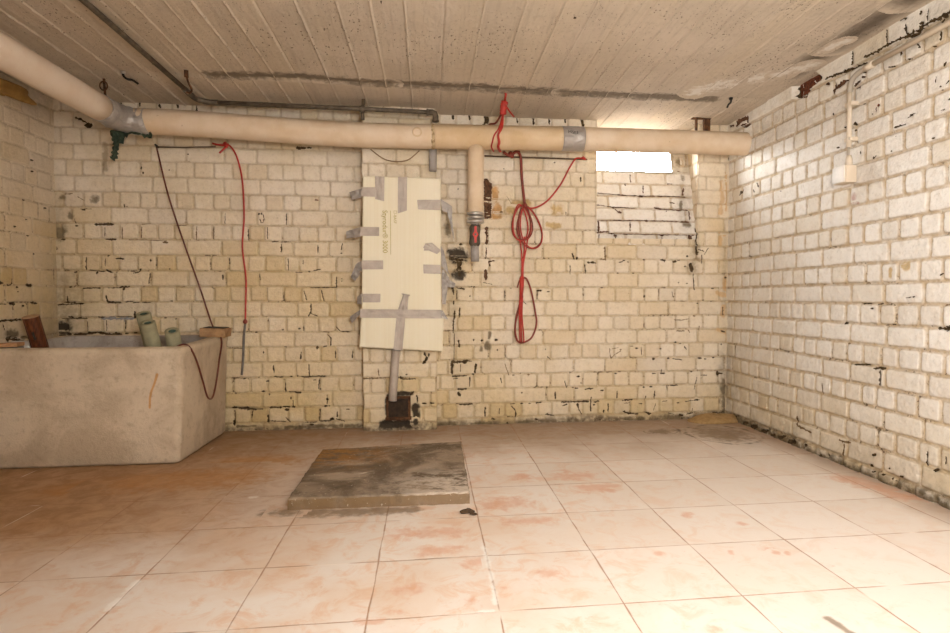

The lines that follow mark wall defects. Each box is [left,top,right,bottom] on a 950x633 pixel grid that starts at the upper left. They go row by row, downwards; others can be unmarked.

water stain [376,390,493,431]
water stain [716,374,950,509]